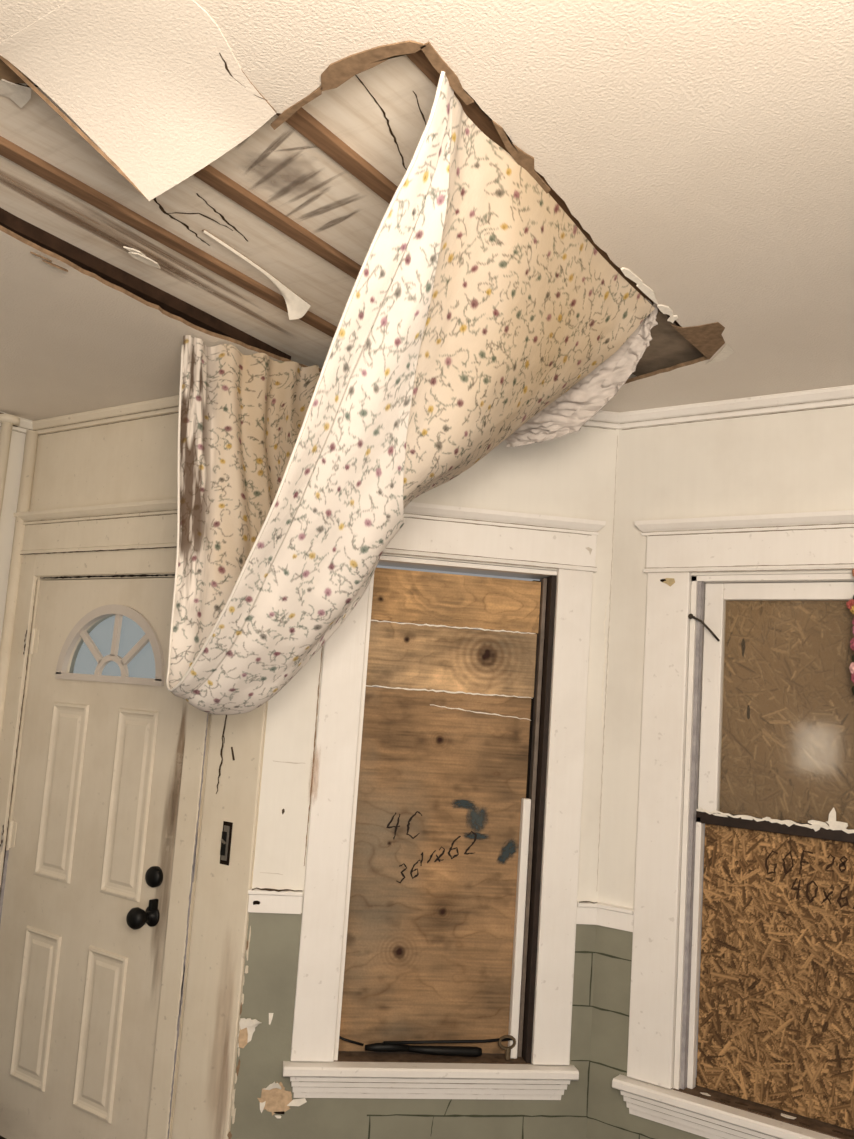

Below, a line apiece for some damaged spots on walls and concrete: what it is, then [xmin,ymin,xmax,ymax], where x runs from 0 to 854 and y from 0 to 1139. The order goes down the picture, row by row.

peeling [271,87,322,130]
leakage [251,138,355,230]
peeling [492,120,551,193]
peeling [671,322,725,359]
peeling [227,926,273,1139]
flaking render [257,1081,307,1118]